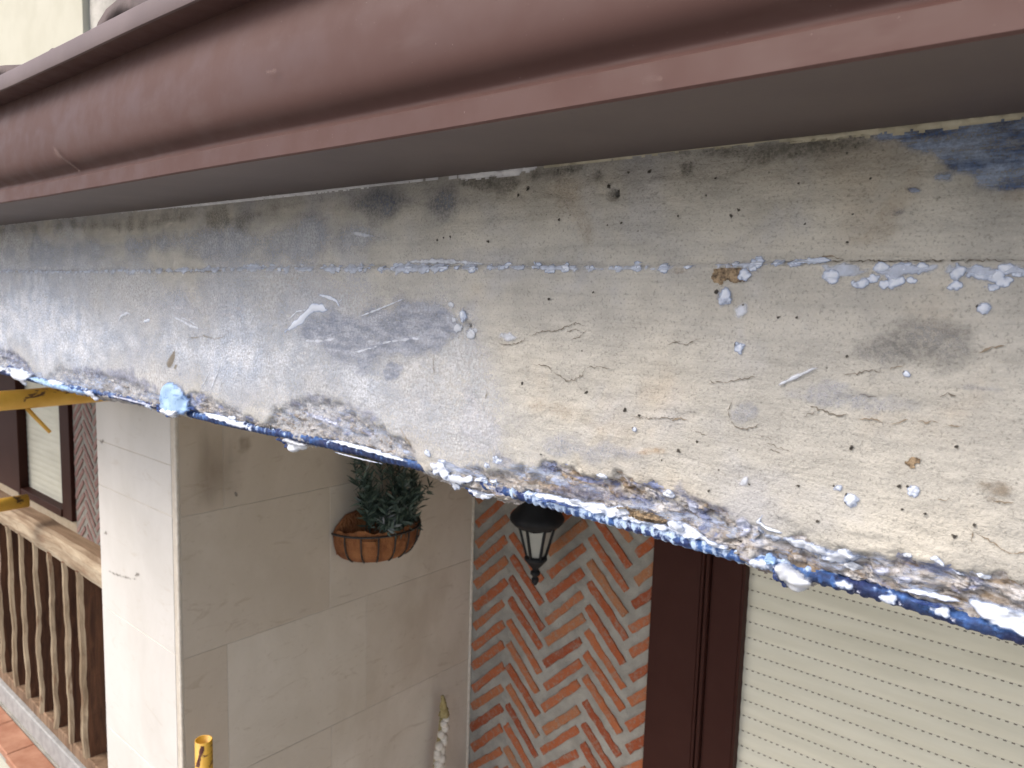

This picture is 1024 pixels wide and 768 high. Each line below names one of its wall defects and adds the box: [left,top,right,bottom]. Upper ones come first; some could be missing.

leakage [877,119,1024,190]
peeling [711,256,801,285]
peeling [822,261,929,289]
peeling [947,263,1024,291]
leakage [0,218,499,464]
crack [499,322,586,345]
spalling [0,349,161,413]
peeling [166,350,177,369]
crack [536,364,608,382]
spalling [175,391,1024,618]